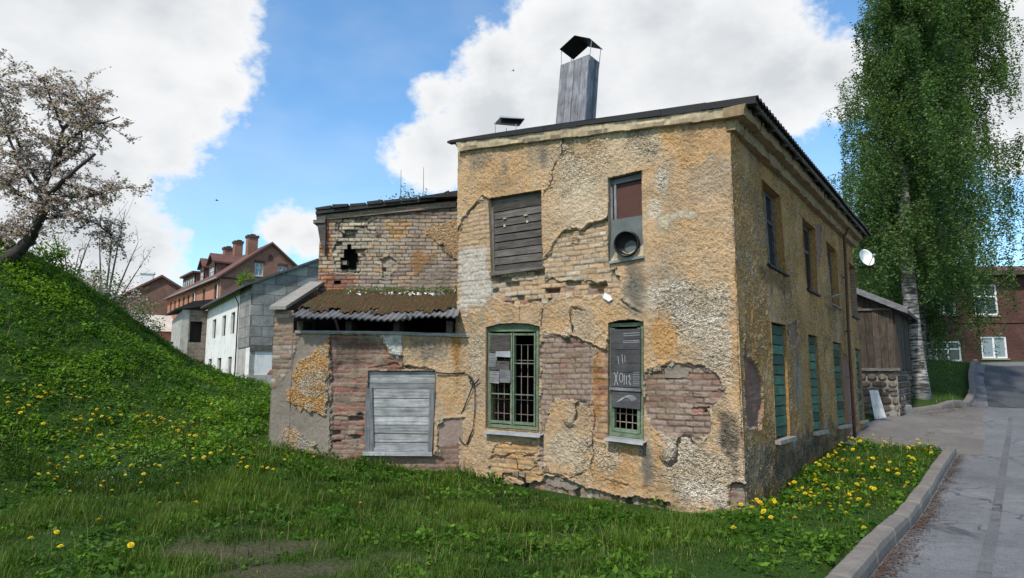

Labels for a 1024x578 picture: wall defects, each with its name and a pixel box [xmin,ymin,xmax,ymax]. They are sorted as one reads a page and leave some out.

spalling [436,196,496,317]
crack [541,219,603,260]
spalling [542,221,620,302]
crack [519,307,601,344]
spalling [329,334,465,472]
crack [491,401,628,485]
spalling [489,334,671,510]
crack [659,434,694,465]
crack [644,363,723,386]
spalling [644,361,727,441]
spalling [743,348,761,427]